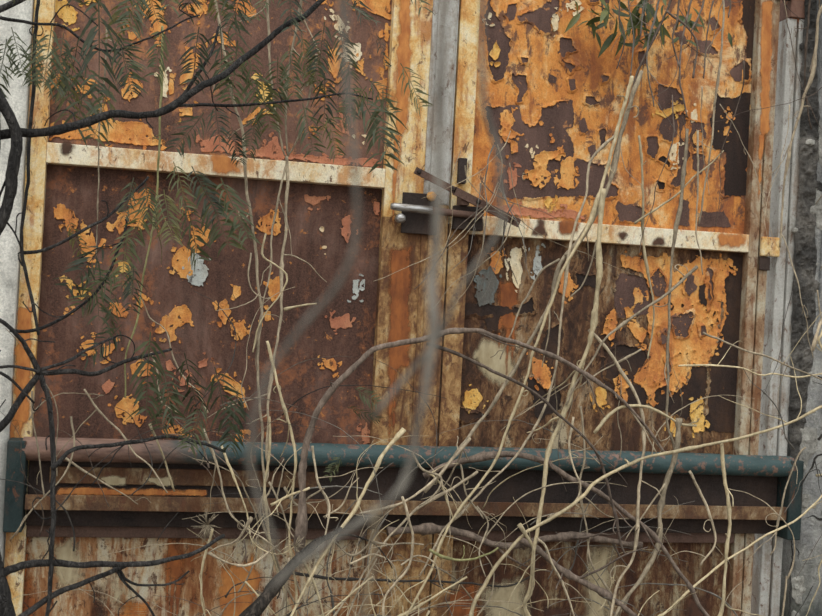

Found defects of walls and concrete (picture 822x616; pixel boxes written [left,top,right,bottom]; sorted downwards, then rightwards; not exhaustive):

peeling [49,97,167,151]
rust [392,0,412,220]
peeling [482,0,648,224]
peeling [643,0,755,228]
rust [758,1,773,195]
peeling [53,189,155,268]
peeling [167,207,216,286]
rust [10,306,32,438]
peeling [590,251,744,438]
rust [23,537,36,616]
rust [56,540,80,585]
rust [218,556,263,616]